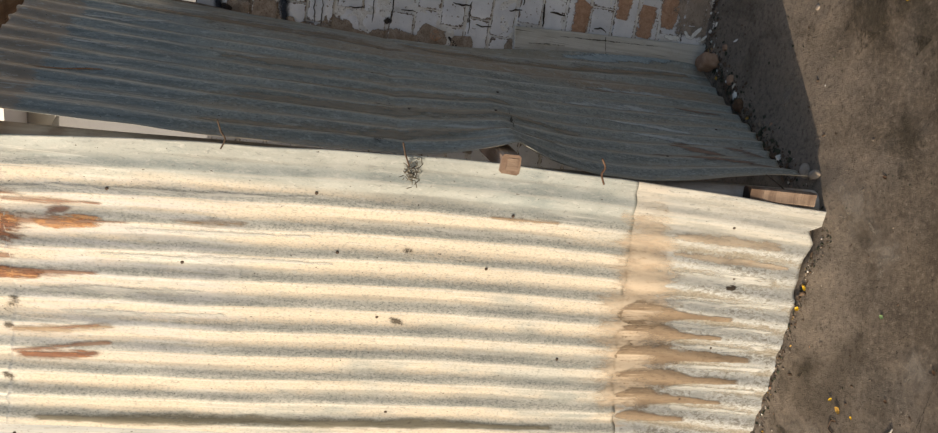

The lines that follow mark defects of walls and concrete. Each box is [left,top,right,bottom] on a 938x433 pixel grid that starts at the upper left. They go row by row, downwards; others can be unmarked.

spalling [227,0,473,48]
peeling [571,0,593,33]
peeling [615,0,712,39]
corrosion [0,191,124,241]
corrosion [0,252,95,278]
corrosion [13,324,111,332]
corrosion [13,341,111,358]